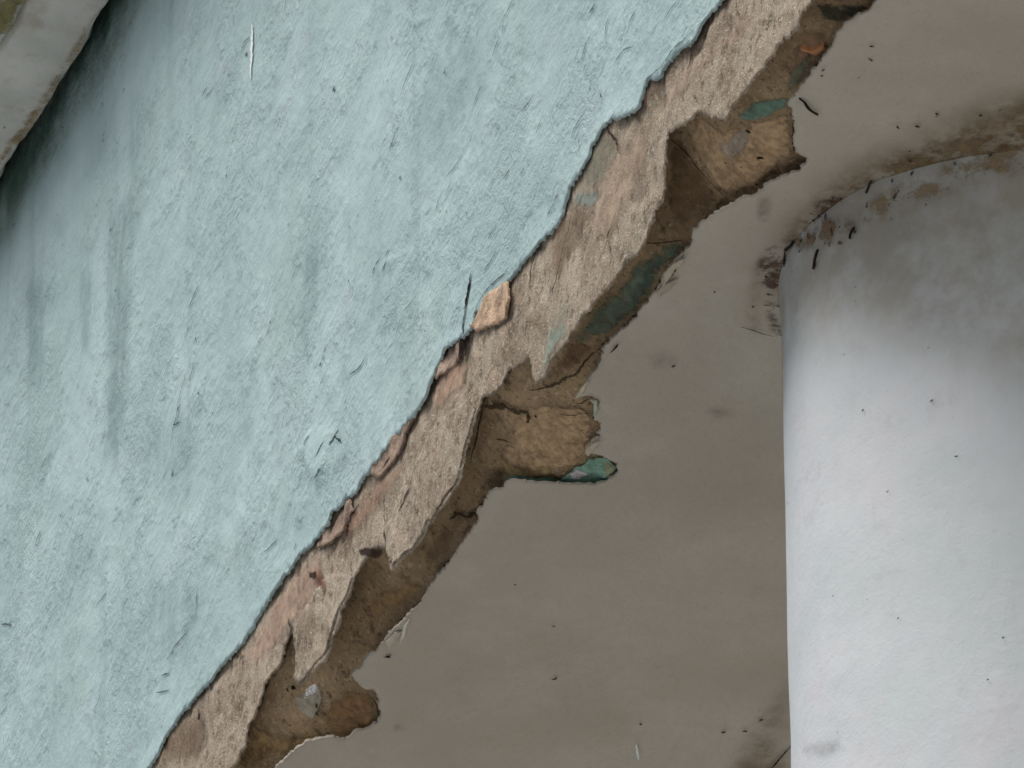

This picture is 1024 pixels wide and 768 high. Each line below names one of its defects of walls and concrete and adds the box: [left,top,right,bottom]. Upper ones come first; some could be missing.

damp [795,197,856,253]
mould [759,257,783,336]
spalling [151,0,826,768]